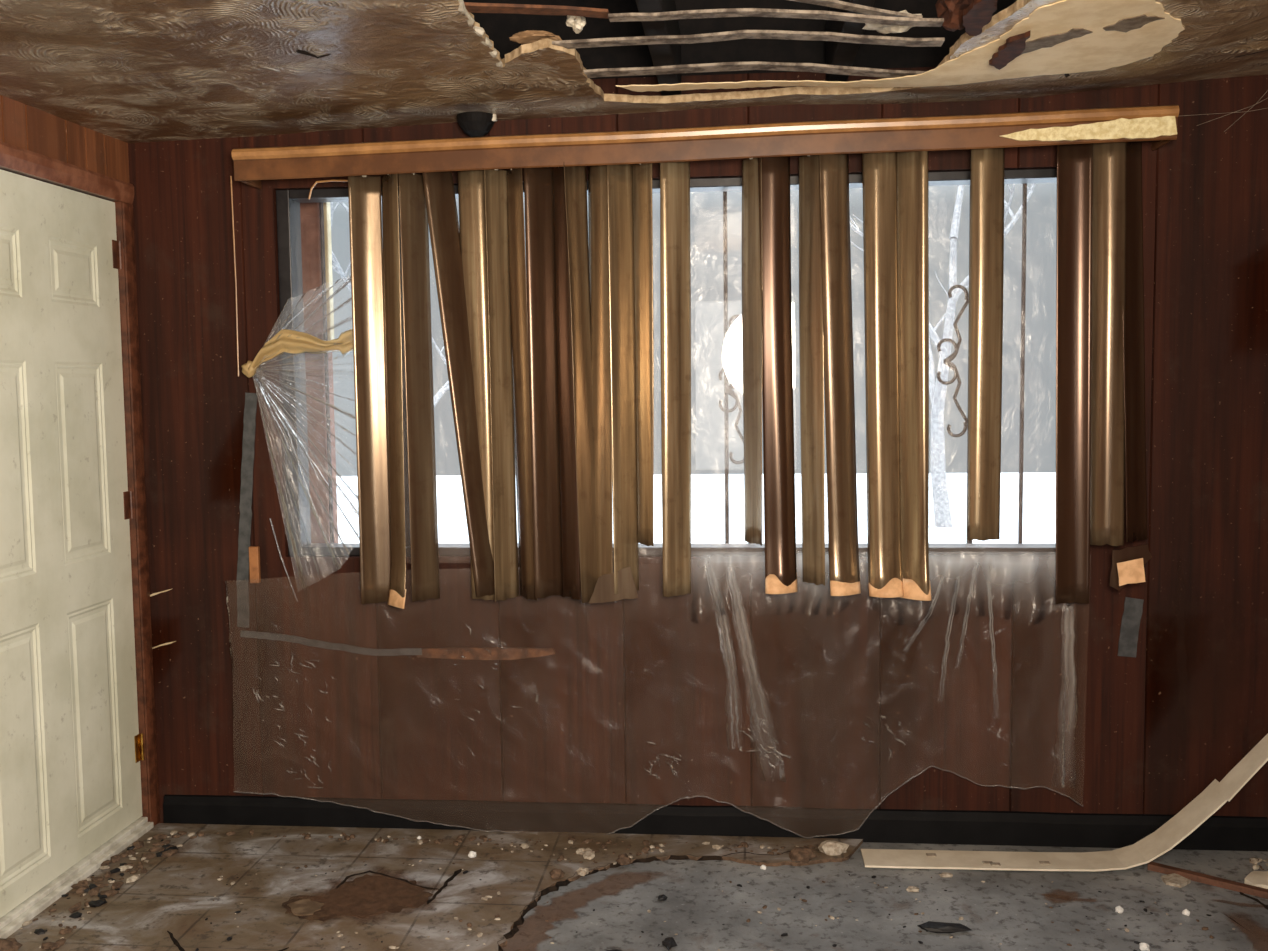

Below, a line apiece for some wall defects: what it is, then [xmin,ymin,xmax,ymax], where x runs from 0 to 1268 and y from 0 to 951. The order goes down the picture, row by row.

spalling [458,0,1185,92]
spalling [282,868,462,922]